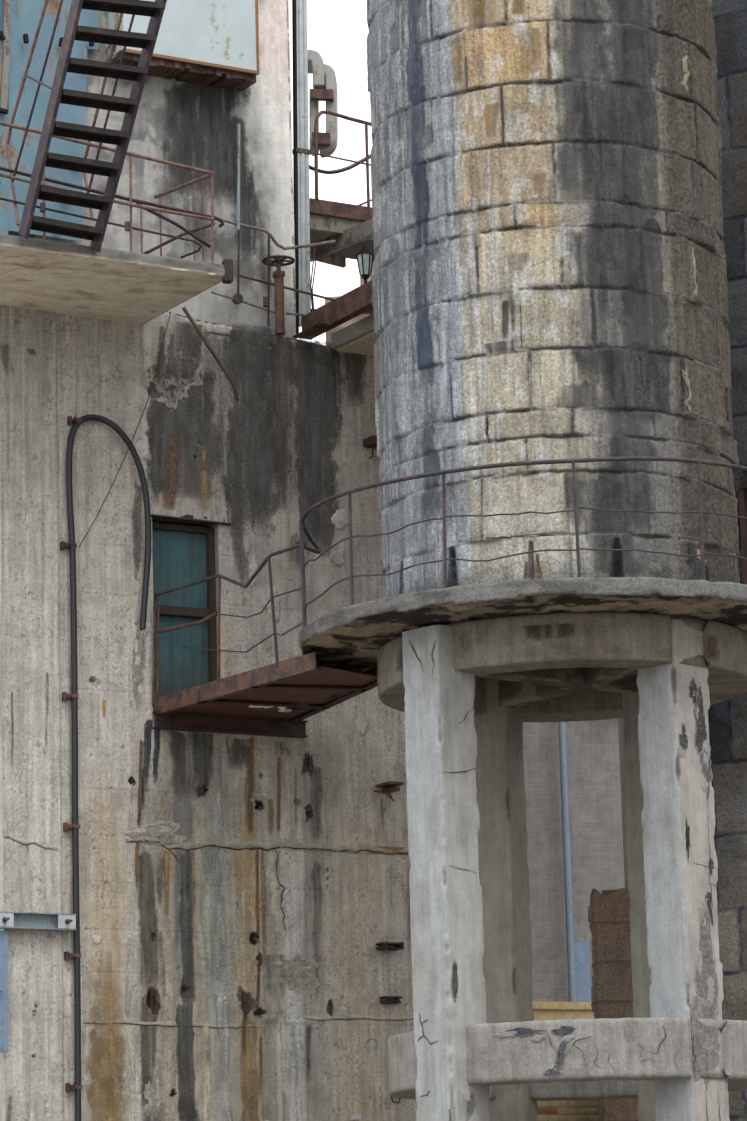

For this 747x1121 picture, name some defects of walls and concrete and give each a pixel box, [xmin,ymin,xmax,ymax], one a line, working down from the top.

damp [554,0,671,577]
damp [132,322,366,578]
crack [408,639,437,674]
spalling [124,820,188,847]
corrosion [245,737,255,831]
crack [124,833,409,932]
spalling [678,676,713,807]
corrosion [85,962,124,1121]
corrosion [241,849,266,1121]
crack [305,1012,437,1044]
crack [546,1026,721,1121]